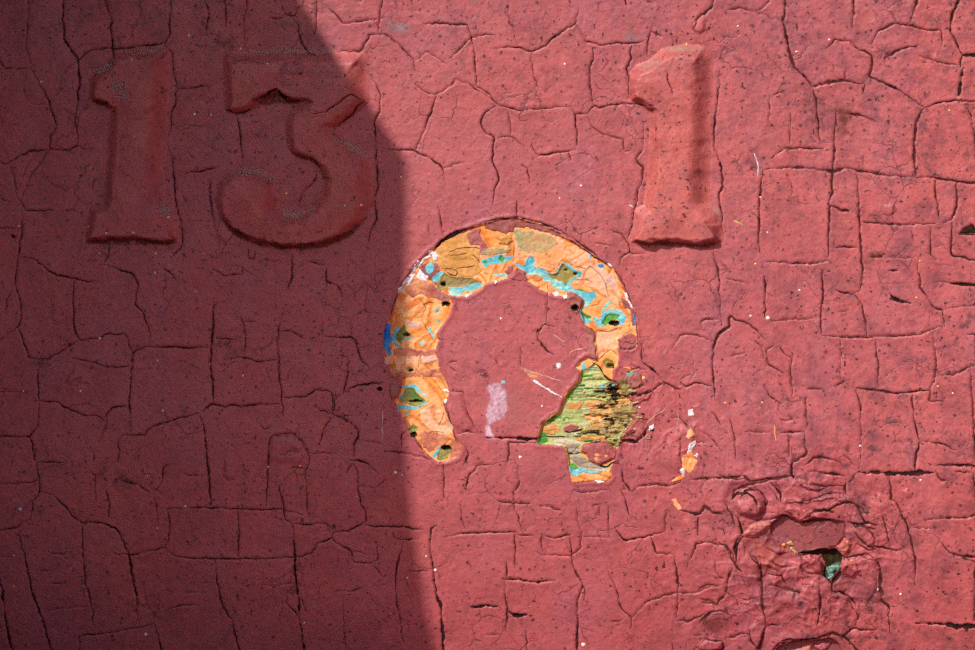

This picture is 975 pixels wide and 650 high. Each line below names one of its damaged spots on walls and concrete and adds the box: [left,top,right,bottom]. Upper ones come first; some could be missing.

crack [269,0,661,265]
crack [0,0,445,650]
peeling [377,217,655,483]
crack [446,0,975,650]
peeling [741,477,859,581]